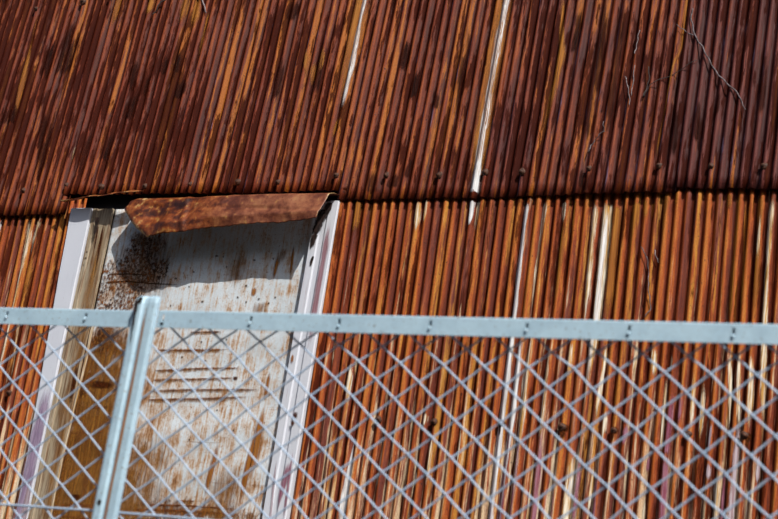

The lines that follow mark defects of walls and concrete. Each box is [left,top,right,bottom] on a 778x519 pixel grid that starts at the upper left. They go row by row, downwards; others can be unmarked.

corrosion [16,42,32,110]
corrosion [180,0,209,57]
corrosion [304,50,325,83]
corrosion [546,5,565,124]
corrosion [657,0,688,149]
corrosion [273,248,294,276]
corrosion [628,193,678,265]
corrosion [727,194,762,314]
corrosion [43,227,168,519]
corrosion [145,367,270,402]
corrosion [118,413,264,519]